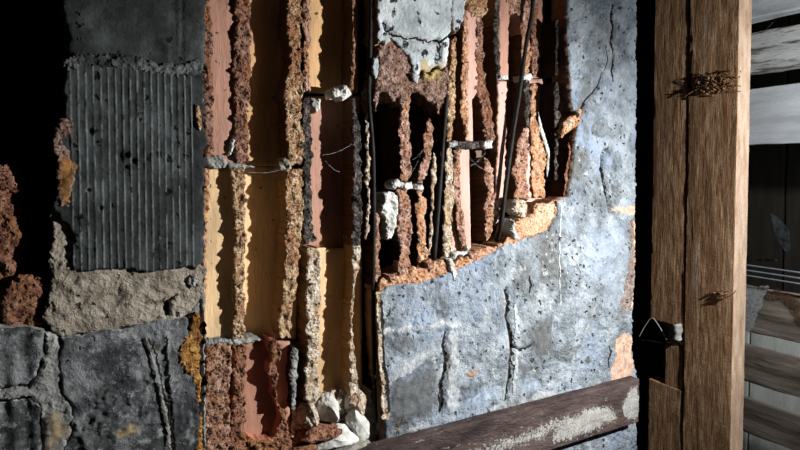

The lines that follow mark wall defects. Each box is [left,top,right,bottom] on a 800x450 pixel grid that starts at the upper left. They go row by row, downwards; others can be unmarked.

spalling [360,32,449,116]
crack [382,22,451,60]
crack [573,4,615,118]
spalling [364,109,583,292]
peeling [599,152,636,311]
corrosion [178,312,204,450]
crack [438,331,448,412]
crack [504,289,531,401]
peeling [610,334,634,380]